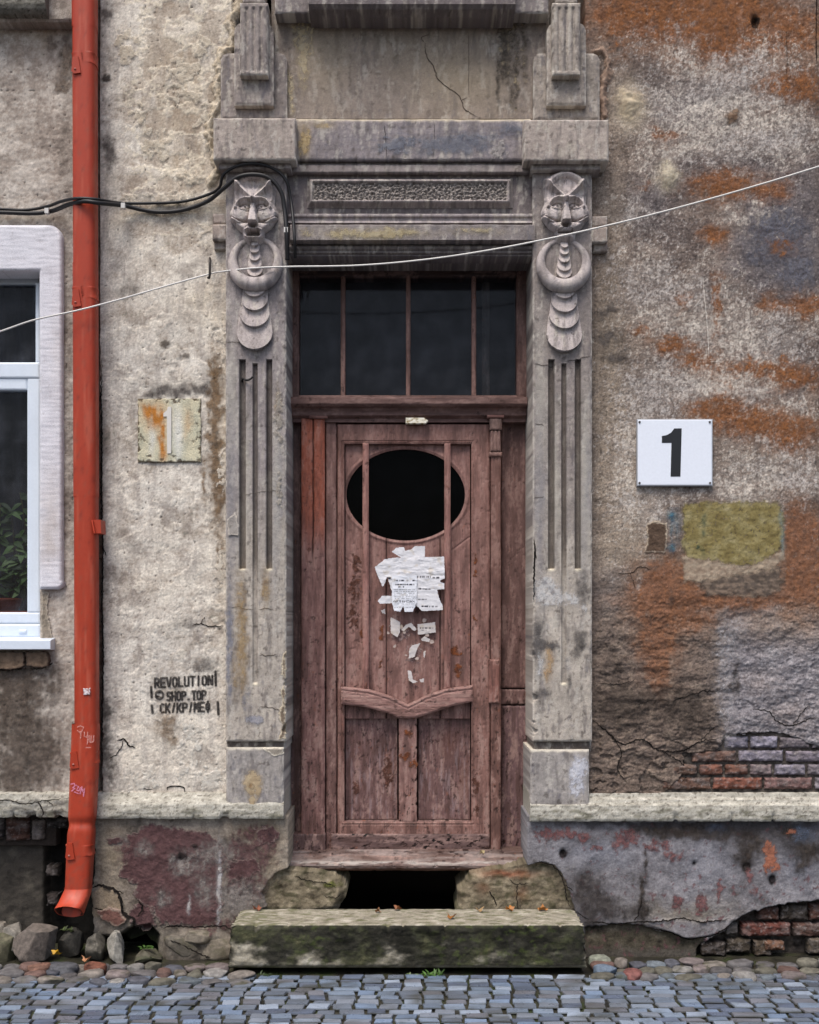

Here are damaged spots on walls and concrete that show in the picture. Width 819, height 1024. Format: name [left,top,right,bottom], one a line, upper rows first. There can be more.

crack [421,34,477,117]
damp [145,357,226,515]
crack [100,361,135,789]
crack [592,705,814,783]
flaking render [662,731,819,792]
flaking render [0,815,69,846]
flaking render [47,890,63,906]
crack [92,884,232,958]
peeling [97,823,280,936]
crack [489,861,736,940]
peeling [672,878,726,916]
flaking render [696,863,819,956]